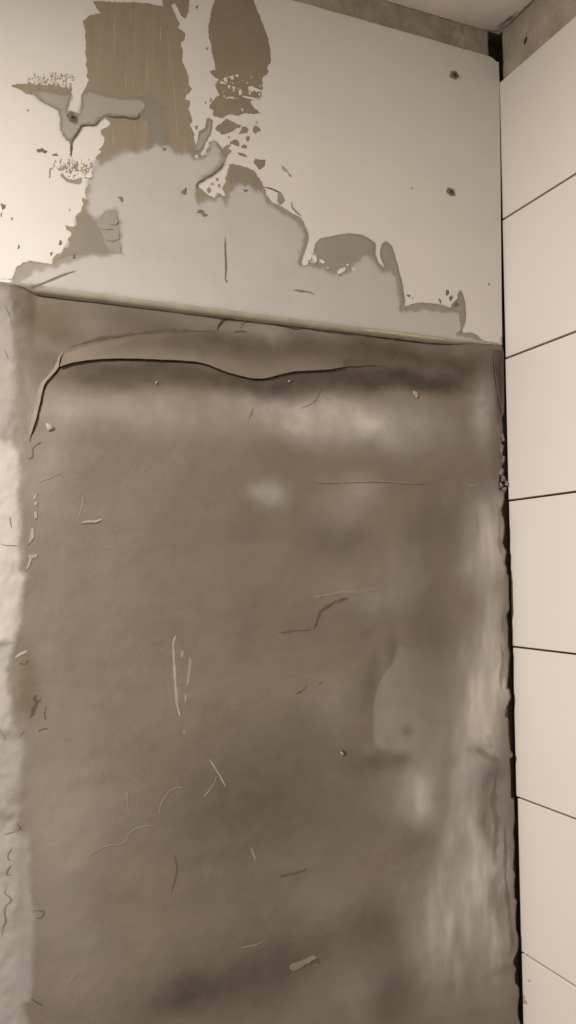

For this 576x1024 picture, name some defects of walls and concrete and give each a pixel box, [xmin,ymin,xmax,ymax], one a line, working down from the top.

peeling [0,0,497,344]
crack [30,318,439,459]
water stain [89,361,456,394]
water stain [172,635,192,716]